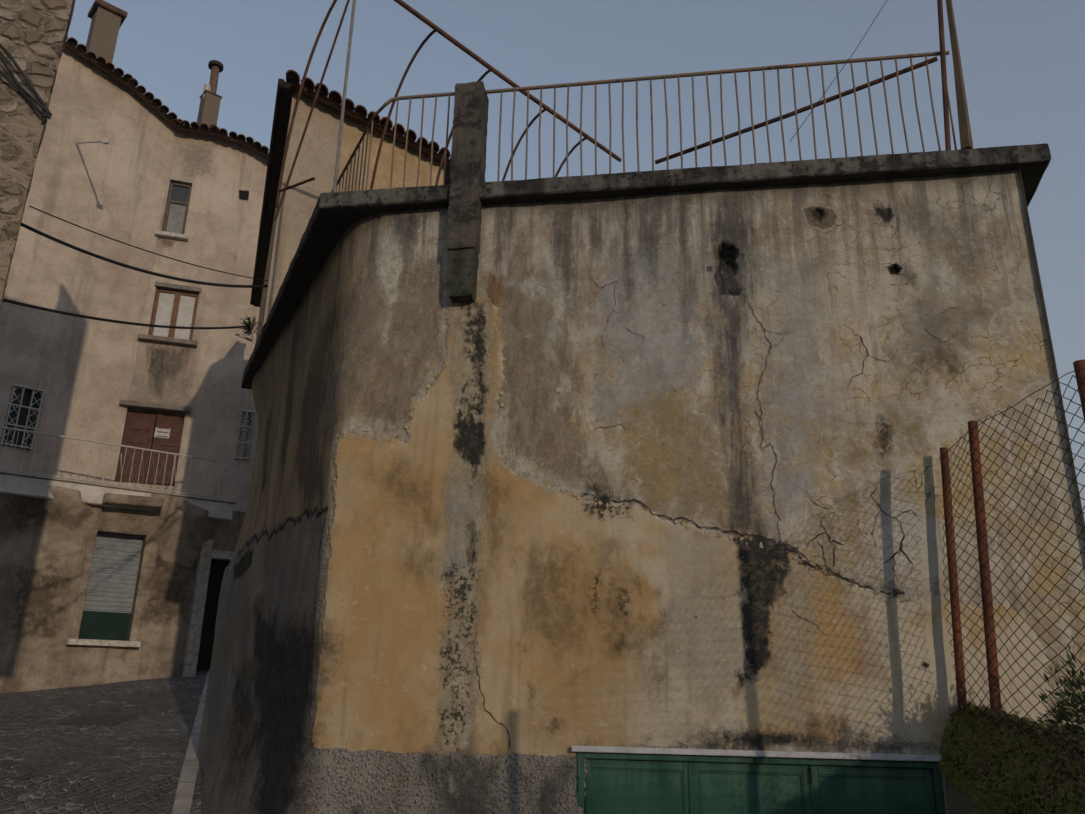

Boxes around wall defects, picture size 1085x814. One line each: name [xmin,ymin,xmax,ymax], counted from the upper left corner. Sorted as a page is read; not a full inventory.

crack [587,270,644,349]
spalling [707,244,745,296]
spalling [800,203,842,233]
water stain [422,274,503,814]
crack [584,303,946,599]
water stain [732,476,799,686]
water stain [228,606,333,814]